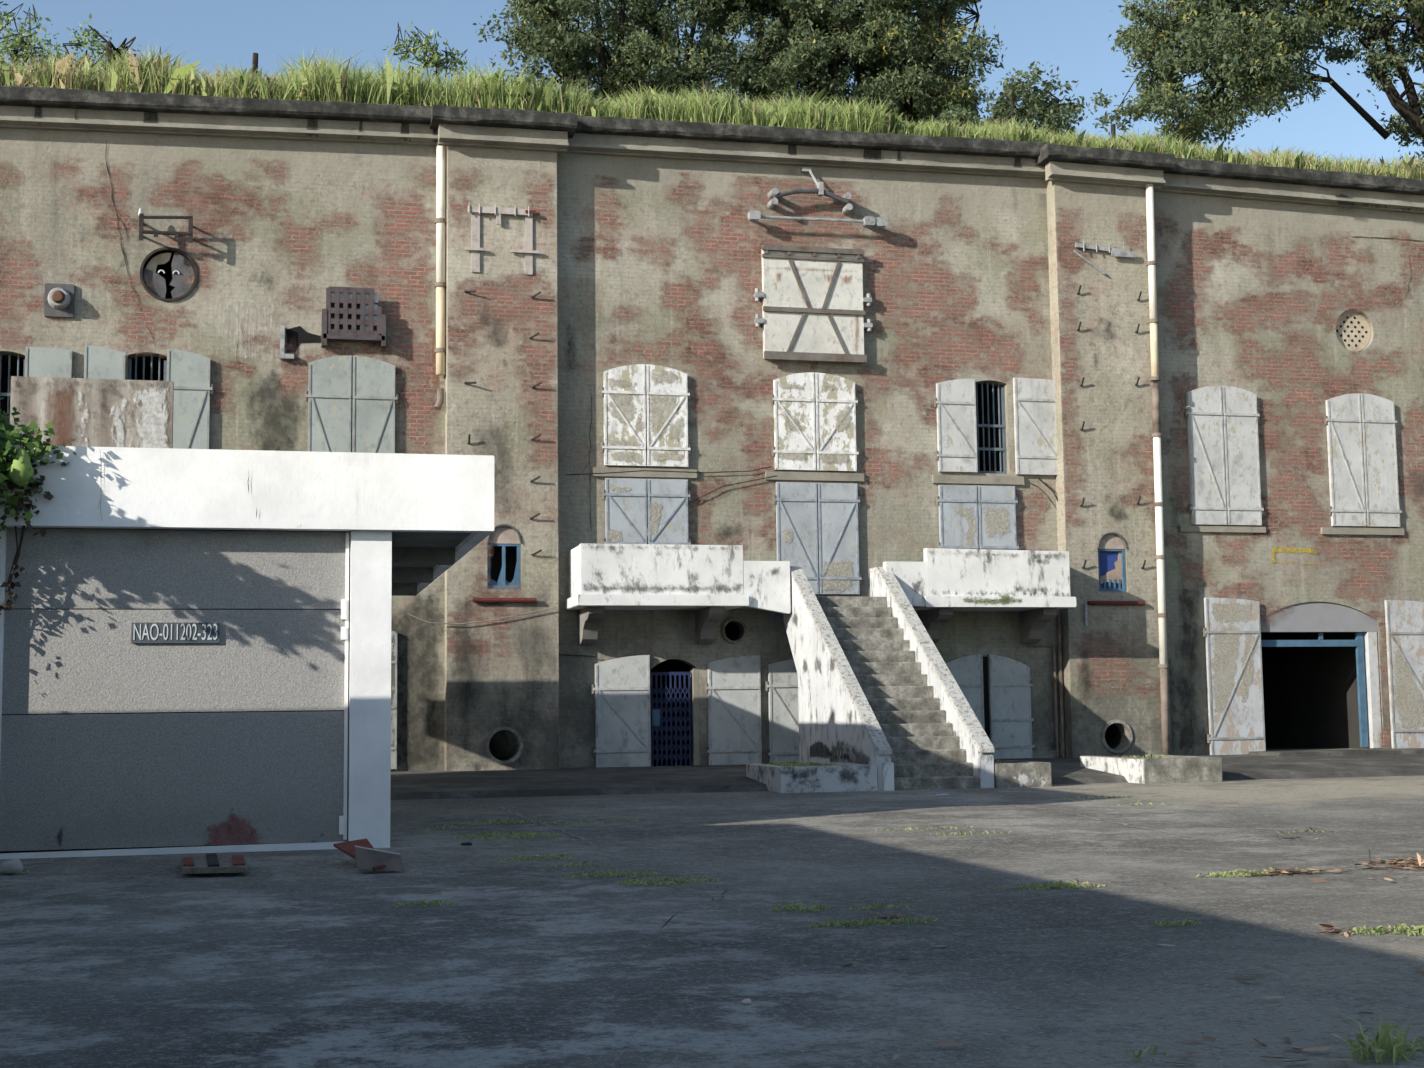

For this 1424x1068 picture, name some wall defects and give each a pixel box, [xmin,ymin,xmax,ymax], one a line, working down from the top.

flaking render [151,160,357,288]
spalling [1336,194,1410,212]
flaking render [79,268,195,349]
flaking render [244,169,558,468]
flaking render [581,172,1089,551]
peeling [110,389,169,448]
damp [250,373,296,451]
flaking render [1118,214,1424,713]
flaking render [1380,728,1390,748]